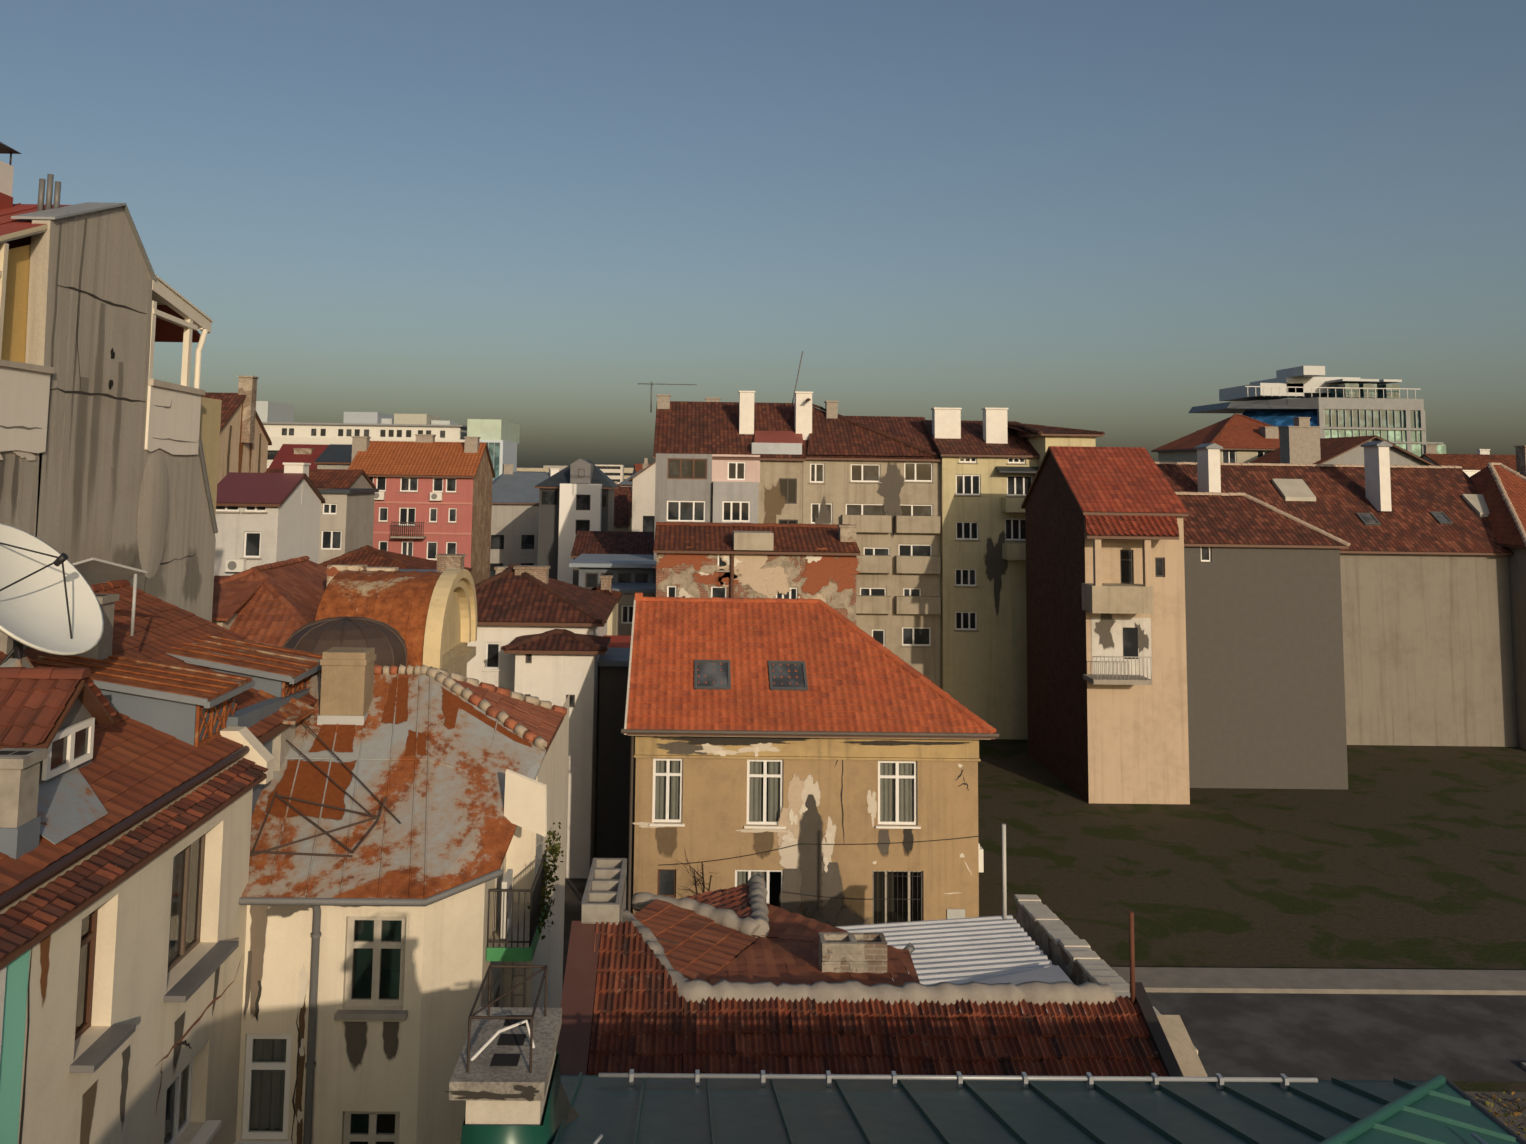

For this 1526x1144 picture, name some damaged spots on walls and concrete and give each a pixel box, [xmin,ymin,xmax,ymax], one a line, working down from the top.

crack [50,282,190,442]
crack [0,423,42,431]
flaking render [653,547,860,603]
rust [381,677,426,756]
rust [442,687,532,747]
rust [265,724,356,820]
flaking render [735,773,837,872]
flaking render [867,790,877,827]